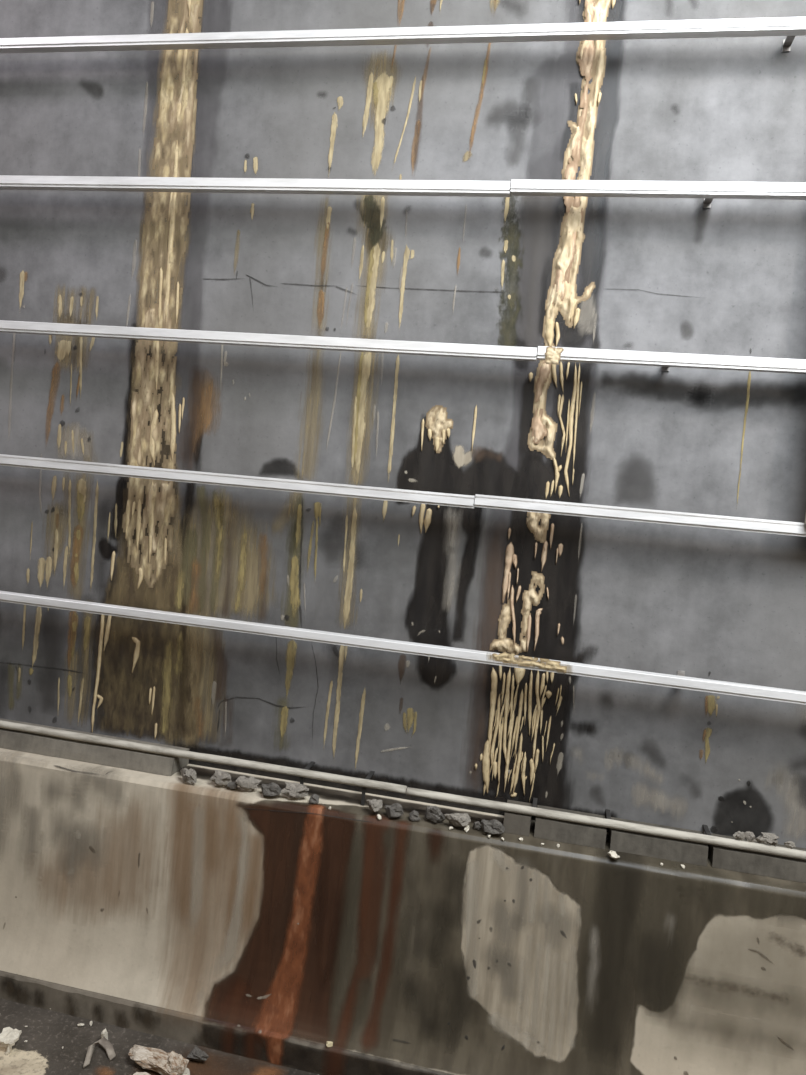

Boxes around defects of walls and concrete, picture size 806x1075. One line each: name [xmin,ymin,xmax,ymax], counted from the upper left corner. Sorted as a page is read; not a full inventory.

leakage [167,0,203,34]
leakage [579,0,623,23]
leakage [144,49,198,177]
leakage [328,96,343,171]
leakage [363,45,430,180]
leakage [464,43,491,161]
leakage [561,40,622,180]
leakage [127,192,191,329]
leakage [46,290,99,461]
leakage [274,194,806,688]
leakage [10,339,806,1075]
corrosion [207,803,408,1047]